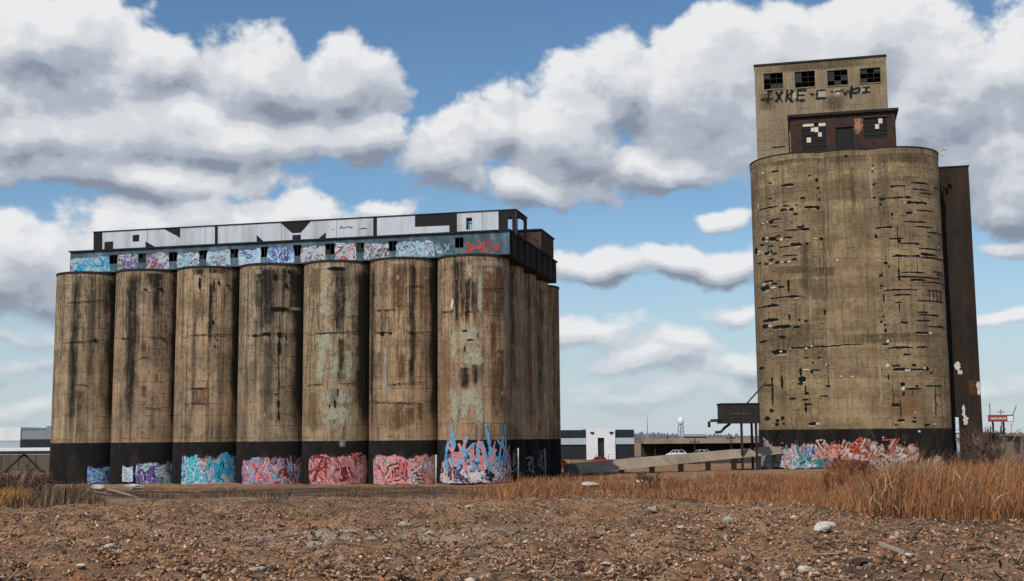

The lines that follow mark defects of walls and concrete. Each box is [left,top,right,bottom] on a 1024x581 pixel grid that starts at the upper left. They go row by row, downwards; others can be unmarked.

water stain [69,273,159,418]
water stain [194,268,240,420]
peeling [320,266,345,316]
peeling [315,331,352,427]
water stain [390,261,438,418]
peeling [450,390,484,425]
spalling [755,174,823,265]
spalling [871,165,945,432]